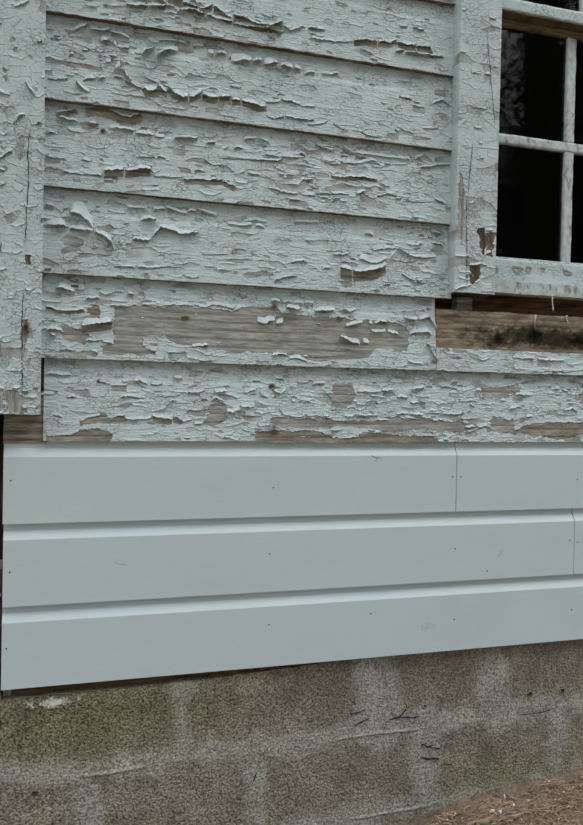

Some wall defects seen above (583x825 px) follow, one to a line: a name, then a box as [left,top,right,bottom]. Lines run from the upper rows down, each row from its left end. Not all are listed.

peeling [142,36,339,75]
peeling [127,0,444,58]
peeling [57,105,164,137]
peeling [106,56,347,131]
peeling [269,174,377,195]
peeling [45,201,115,251]
peeling [127,205,217,240]
peeling [322,225,442,282]
peeling [469,228,496,285]
peeling [46,282,438,362]
damp [477,324,583,350]
peeling [47,381,583,444]